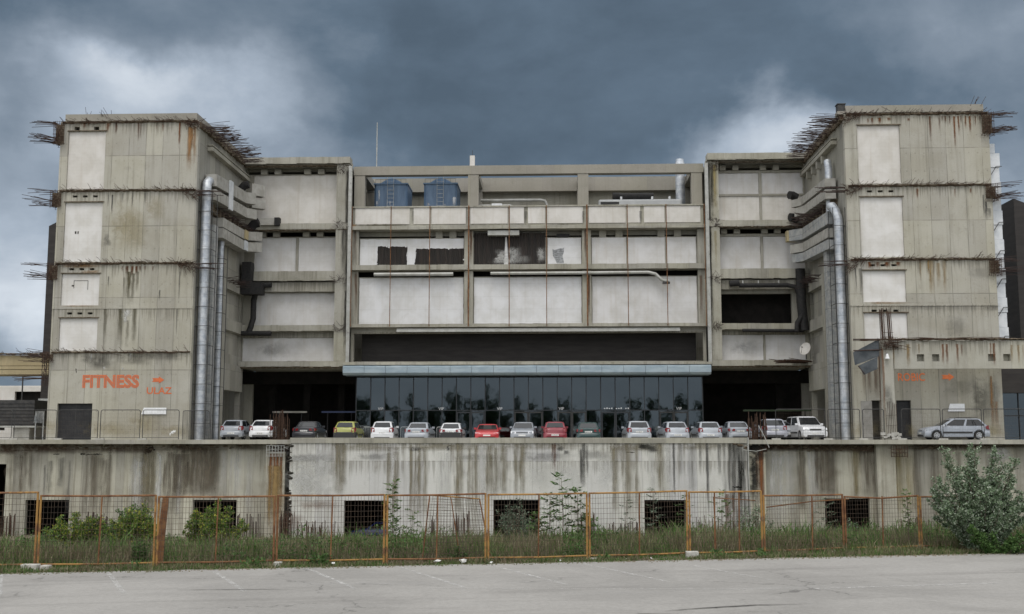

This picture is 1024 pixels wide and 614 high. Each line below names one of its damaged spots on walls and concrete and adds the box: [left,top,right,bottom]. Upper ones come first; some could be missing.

corrosion [179,123,196,160]
damp [134,449,217,503]
damp [387,445,420,494]
damp [456,443,524,502]
damp [612,447,637,491]
damp [658,443,675,486]
damp [798,449,833,504]